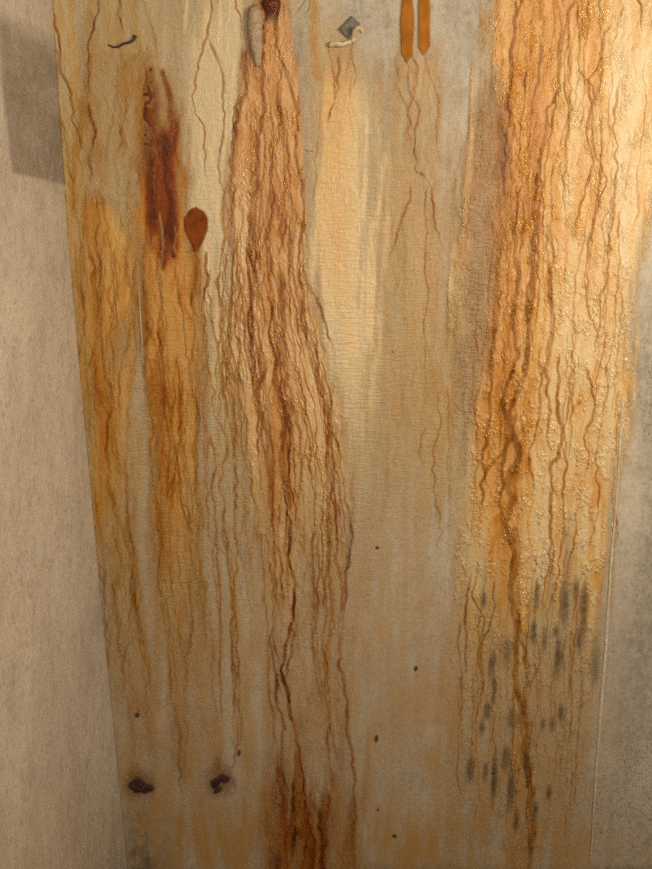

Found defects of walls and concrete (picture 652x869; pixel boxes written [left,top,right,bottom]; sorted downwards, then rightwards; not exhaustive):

rust [52,0,208,657]
water stain [72,0,256,761]
rust [224,0,358,869]
water stain [305,0,453,500]
rust [396,0,652,856]